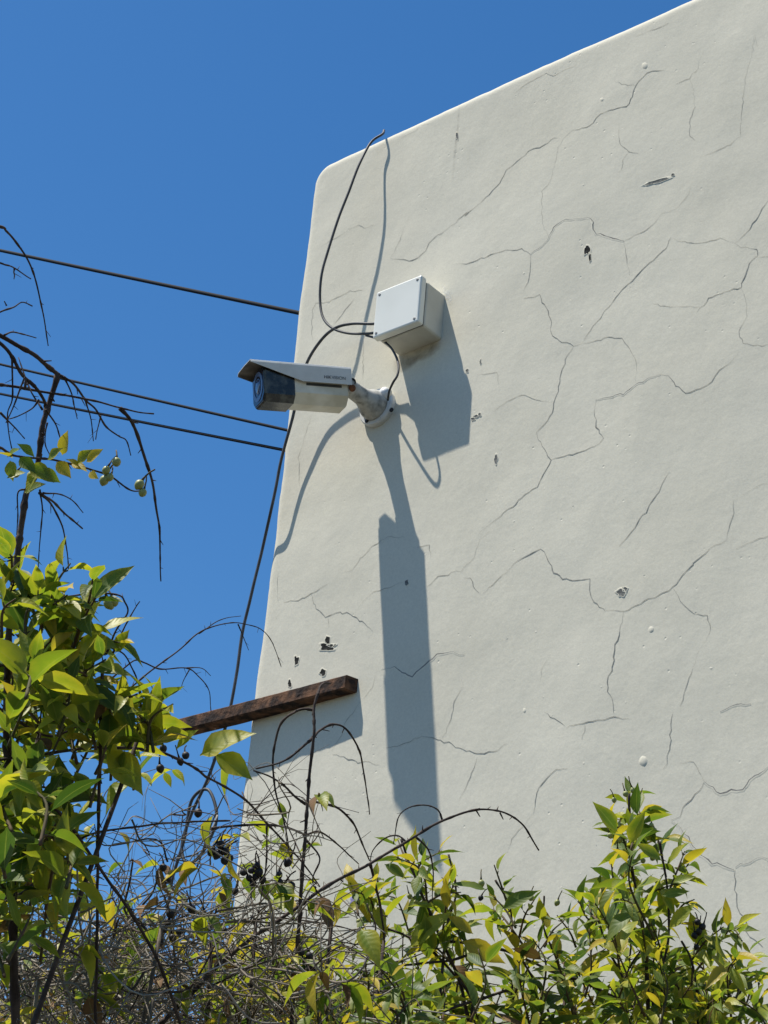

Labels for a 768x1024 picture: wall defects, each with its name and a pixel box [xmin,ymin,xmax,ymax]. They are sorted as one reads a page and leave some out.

spalling [641,173,675,187]
crack [334,64,768,947]
spalling [615,586,629,598]
crack [277,577,402,627]
spalling [318,635,338,652]